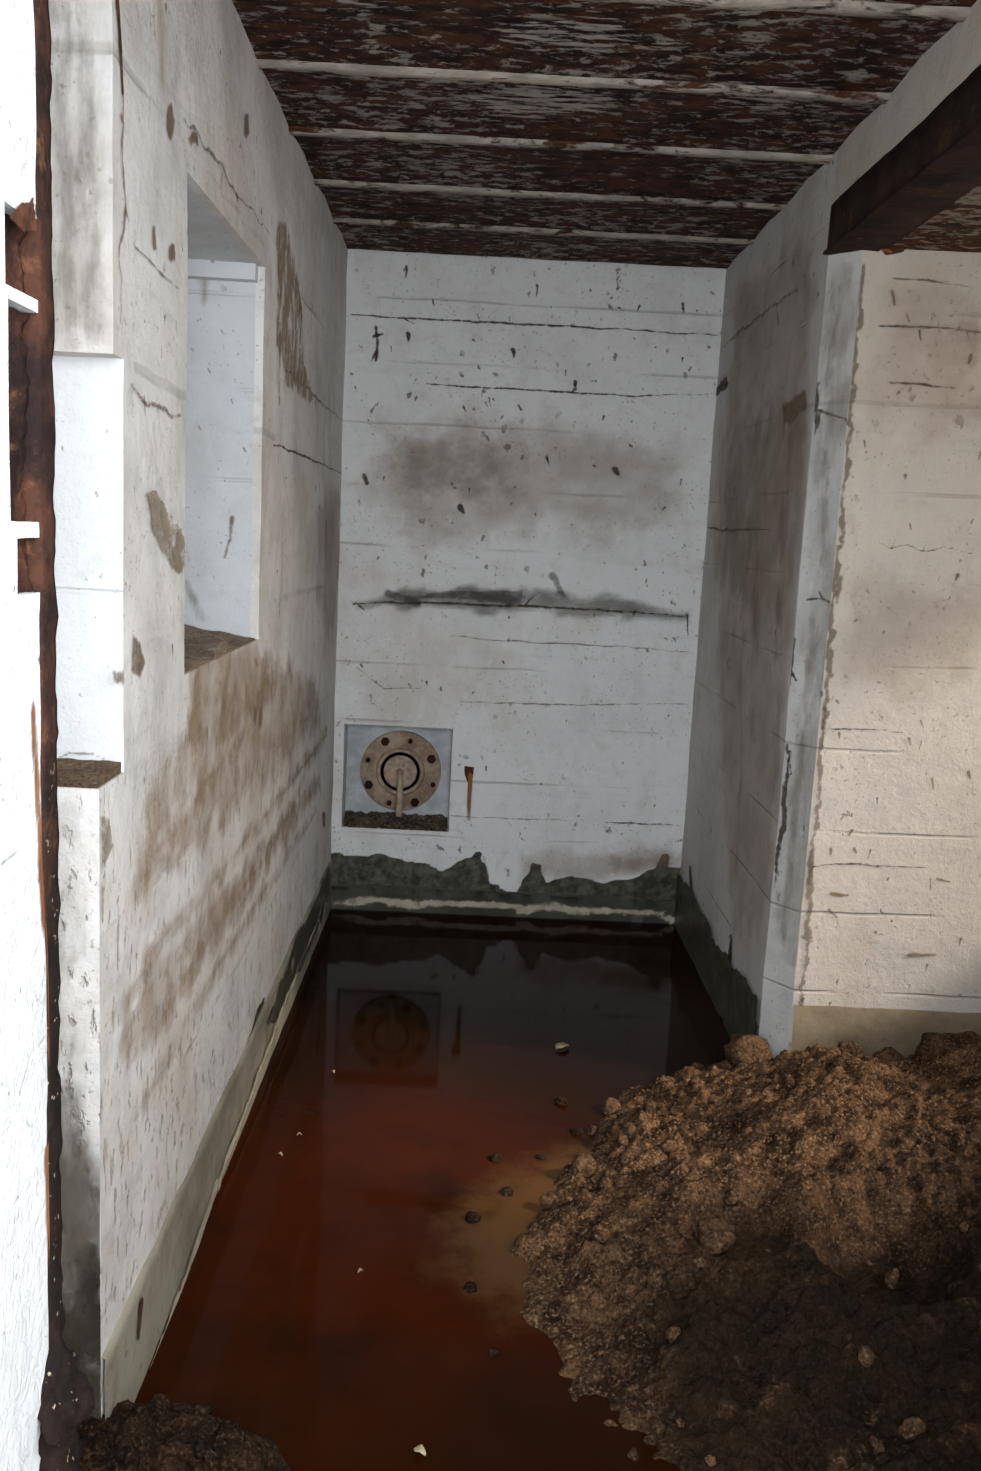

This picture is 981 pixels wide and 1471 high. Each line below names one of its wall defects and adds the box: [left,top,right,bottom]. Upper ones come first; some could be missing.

peeling [488,14,683,59]
peeling [428,84,651,123]
crack [185,121,263,225]
peeling [276,221,316,403]
peeling [147,491,185,574]
leakage [447,591,513,603]
peeling [113,637,145,683]
leakage [190,649,318,826]
rust [464,766,474,817]
crack [774,744,924,880]
leakage [142,852,757,1368]
leakage [59,1132,101,1420]